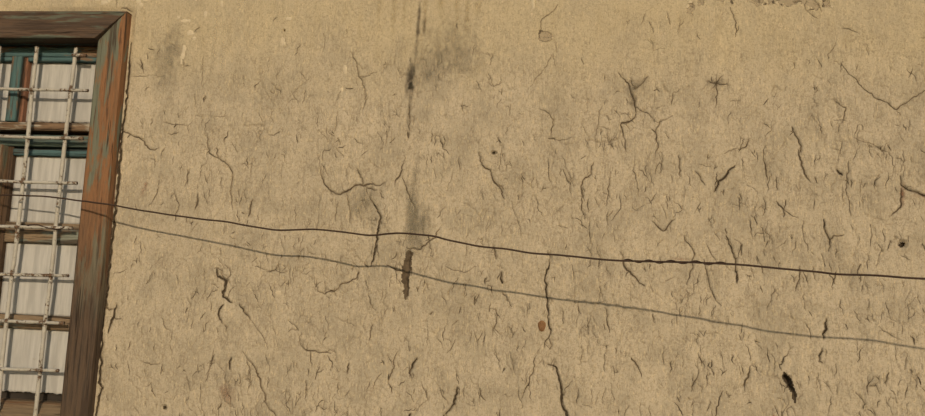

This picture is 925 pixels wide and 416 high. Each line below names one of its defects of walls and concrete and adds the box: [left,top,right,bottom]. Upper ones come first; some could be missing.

crack [95,45,642,416]
crack [466,42,925,416]